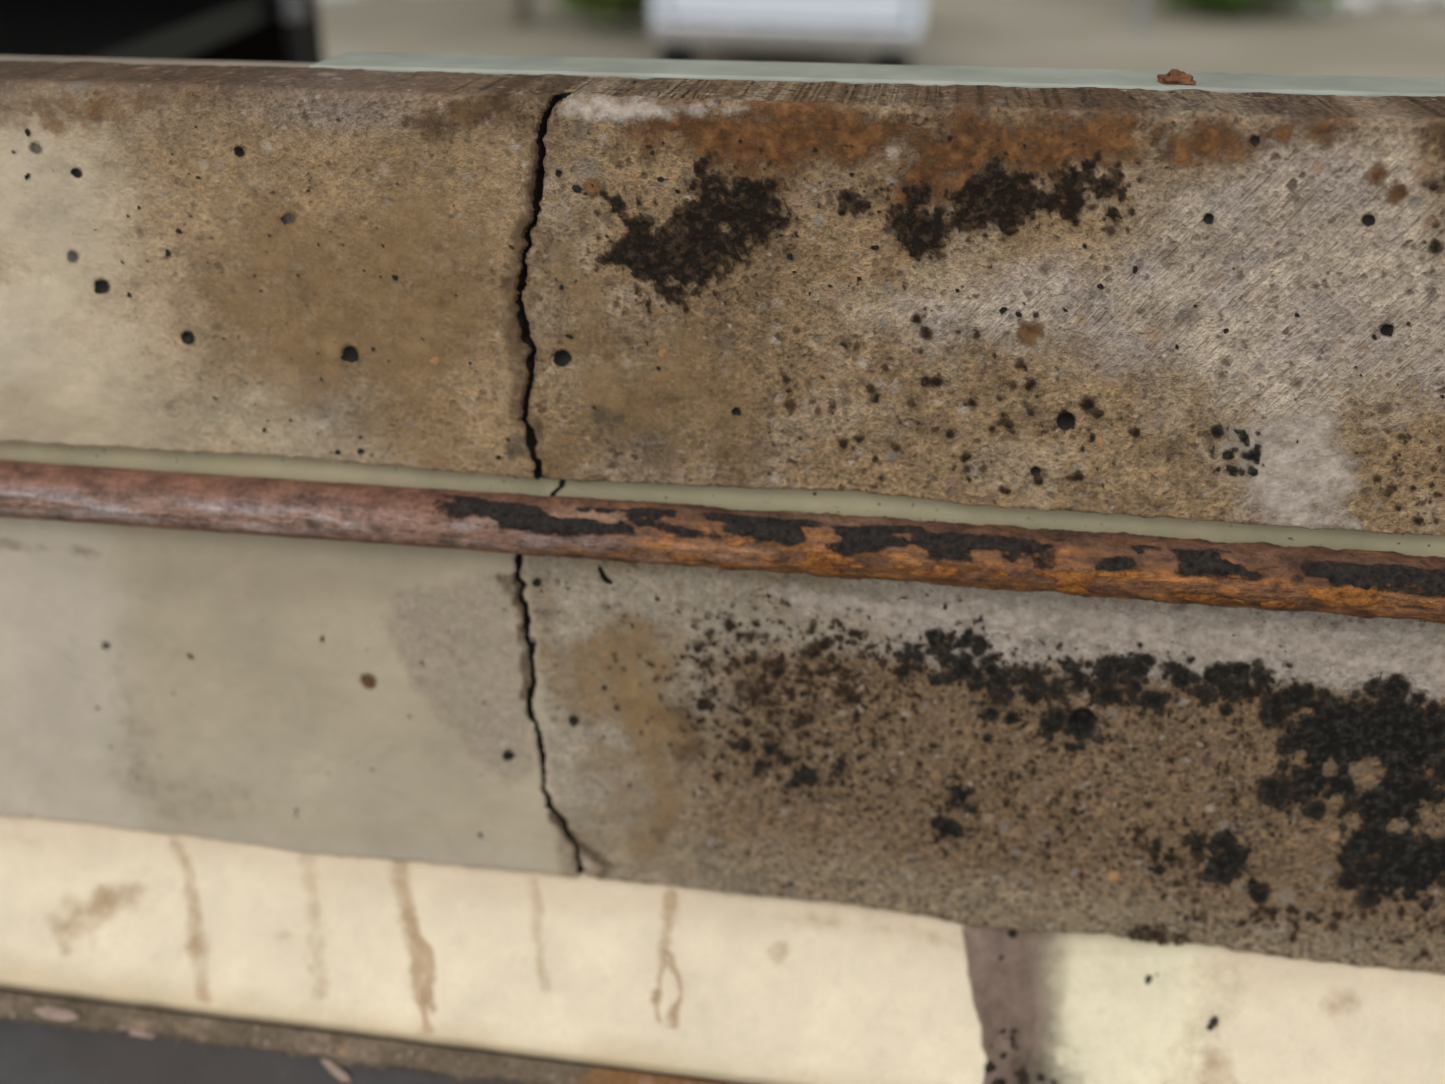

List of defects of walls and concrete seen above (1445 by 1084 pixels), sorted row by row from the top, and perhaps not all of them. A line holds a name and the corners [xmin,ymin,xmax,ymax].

crack [502,75,584,496]
water stain [582,138,1140,319]
corrosion [630,81,1141,206]
water stain [911,314,933,355]
corrosion [1365,166,1408,203]
water stain [779,356,865,450]
water stain [865,357,1140,504]
crack [598,566,613,584]
corrosion [1035,570,1142,595]
corrosion [1169,575,1385,608]
crack [513,554,605,874]
water stain [572,594,1445,962]